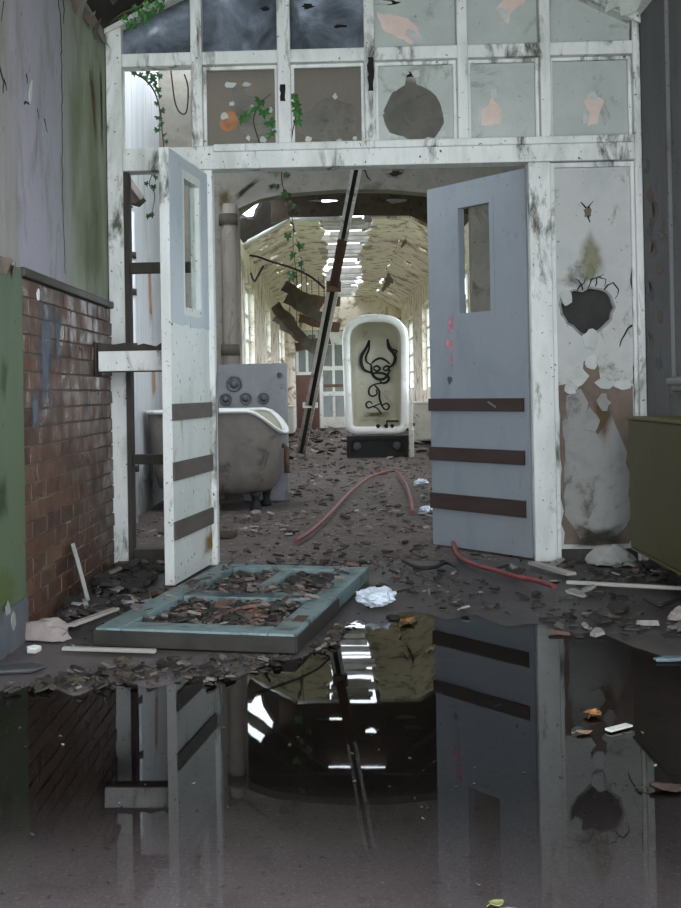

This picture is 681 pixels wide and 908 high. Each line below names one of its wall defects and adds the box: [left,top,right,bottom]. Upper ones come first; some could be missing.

peeling [605,0,642,16]
flaking render [558,275,633,546]
spalling [5,601,16,631]